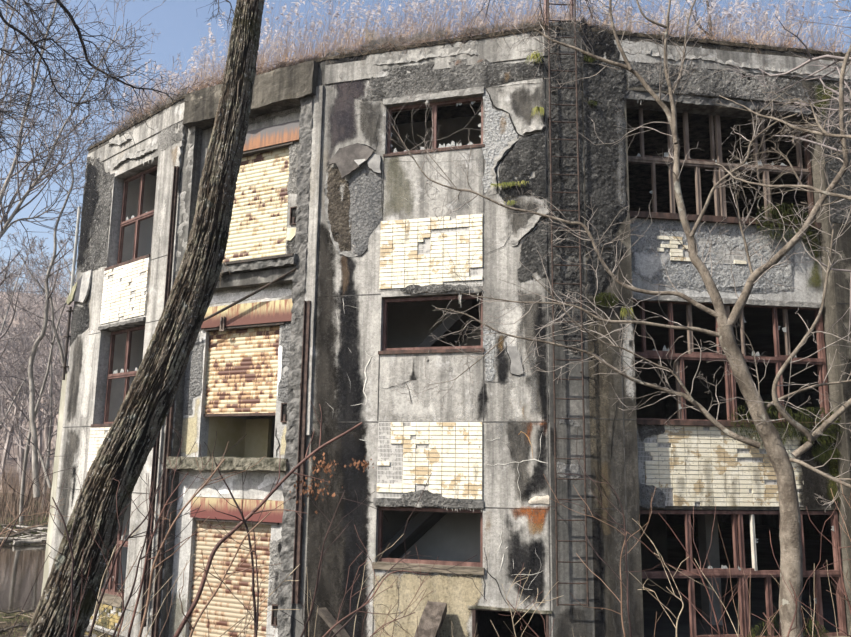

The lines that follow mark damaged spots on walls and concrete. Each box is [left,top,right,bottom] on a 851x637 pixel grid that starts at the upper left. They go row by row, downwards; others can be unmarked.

spalling [66,157,115,346]
spalling [324,112,384,257]
spalling [358,20,851,356]
leakage [304,223,482,637]
leakage [507,522,545,605]
rust [513,507,549,530]
spalling [638,425,665,441]
spalling [639,483,666,509]